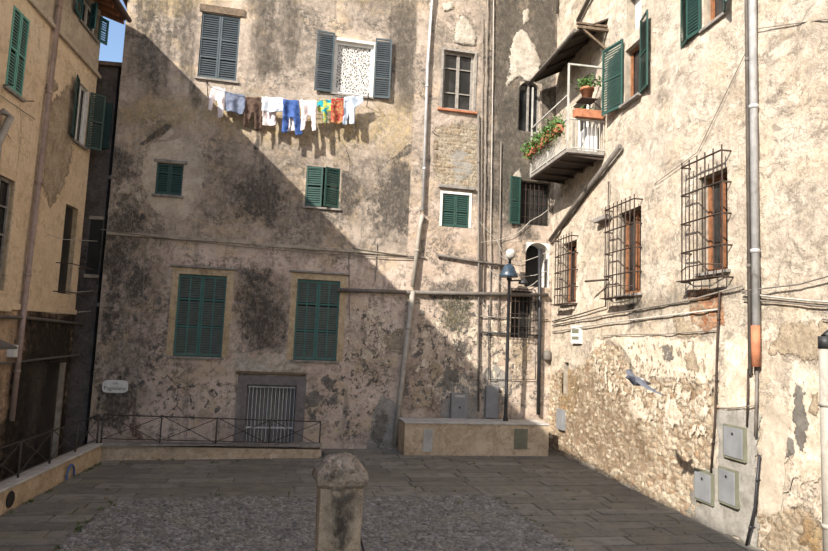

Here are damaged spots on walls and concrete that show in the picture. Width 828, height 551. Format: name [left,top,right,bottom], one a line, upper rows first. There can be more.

leakage [138,0,204,93]
leakage [253,0,277,77]
leakage [286,0,298,58]
leakage [300,2,416,150]
leakage [232,167,286,227]
leakage [340,160,411,234]
leakage [100,147,151,345]
leakage [235,266,286,349]
leakage [90,384,136,432]
leakage [238,359,304,375]
peeling [590,287,761,443]
peeling [768,319,828,522]